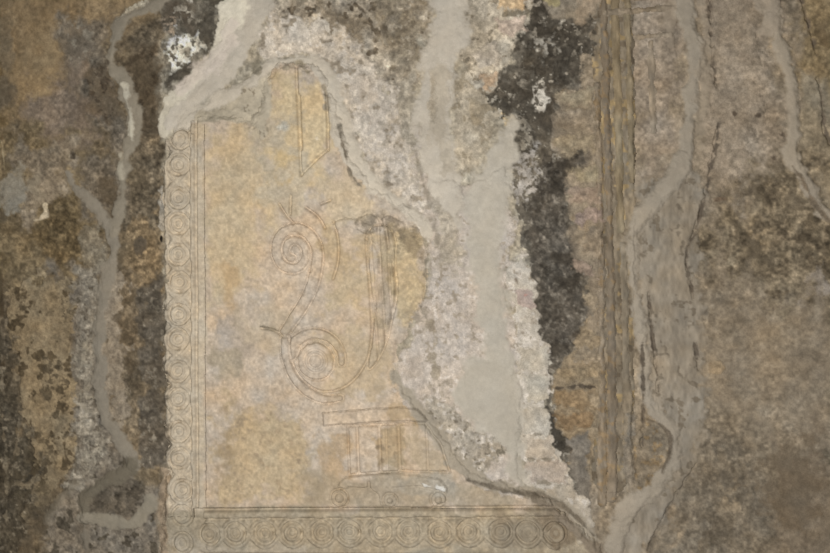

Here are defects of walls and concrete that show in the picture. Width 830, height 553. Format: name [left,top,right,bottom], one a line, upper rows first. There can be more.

crack [41,0,173,553]
spalling [250,60,264,78]
spalling [275,0,431,94]
spalling [388,134,509,479]
flaking render [451,0,535,186]
damp [485,0,602,374]
flaking render [501,78,609,527]
crack [388,0,728,553]
damp [545,394,573,478]
crack [750,0,830,227]